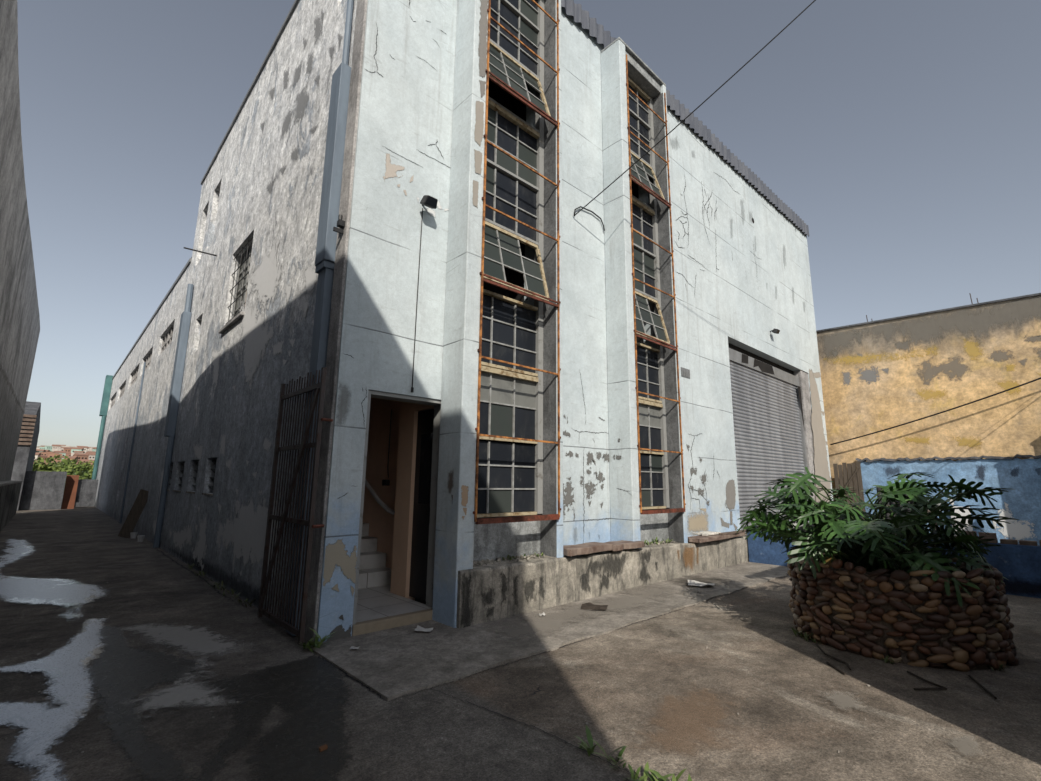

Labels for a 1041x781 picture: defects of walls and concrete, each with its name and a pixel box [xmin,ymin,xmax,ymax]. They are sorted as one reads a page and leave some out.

spalling [268,9,324,140]
spalling [267,148,298,193]
peeling [383,153,449,218]
crack [674,173,760,297]
peeling [212,235,317,391]
peeling [824,336,1041,400]
peeling [153,489,284,576]
peeling [323,539,357,596]
leakage [460,550,689,639]
peeling [563,438,621,521]
peeling [686,444,709,504]
peeling [993,502,1037,540]